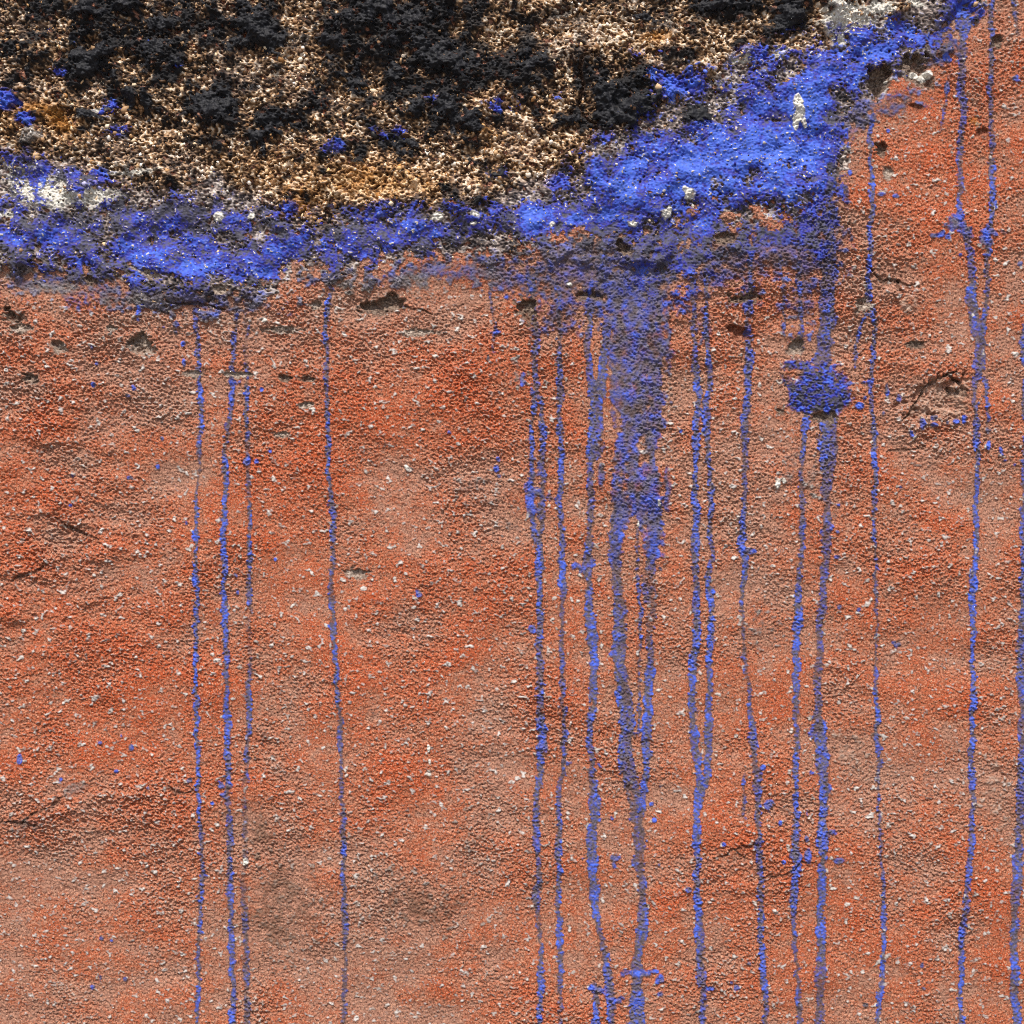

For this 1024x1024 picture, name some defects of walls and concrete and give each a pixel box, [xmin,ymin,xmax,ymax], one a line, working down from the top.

crack [902,371,968,421]